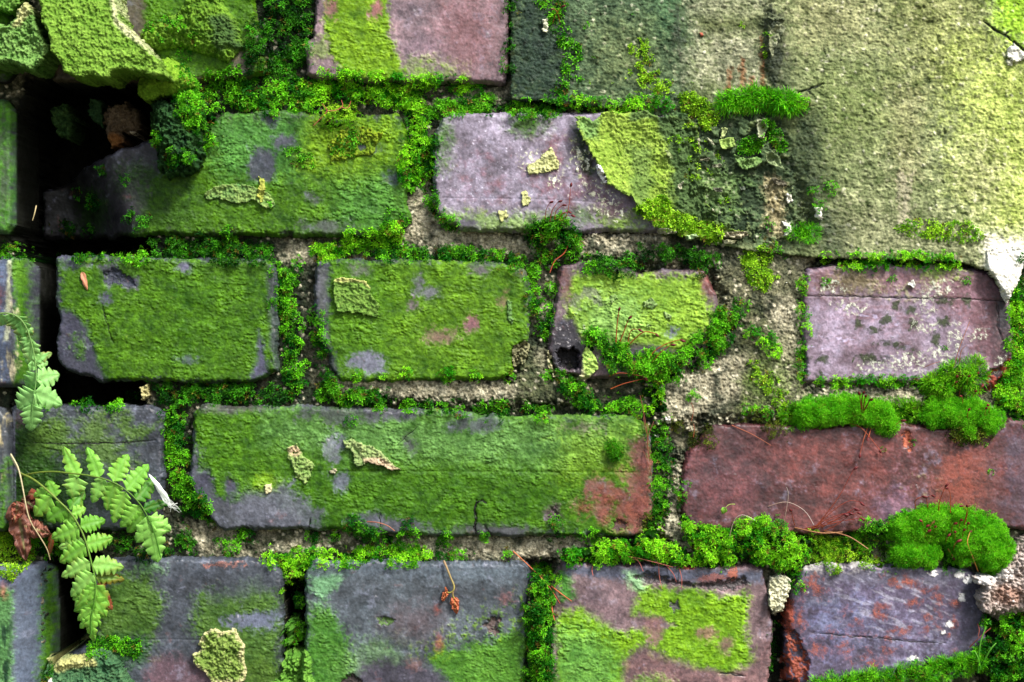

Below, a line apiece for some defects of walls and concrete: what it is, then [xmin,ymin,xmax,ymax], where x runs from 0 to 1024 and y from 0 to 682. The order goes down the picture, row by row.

flaking render [986,246,1024,303]
spalling [557,347,579,369]